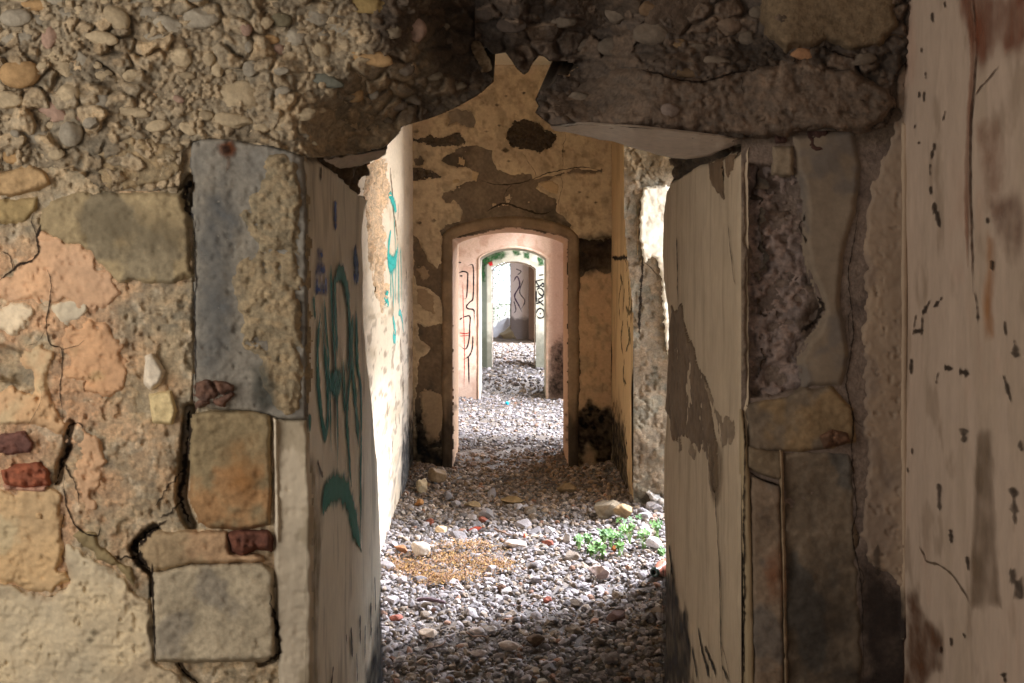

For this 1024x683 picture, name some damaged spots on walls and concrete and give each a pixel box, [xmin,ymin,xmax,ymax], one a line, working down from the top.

rust [220,142,235,164]
spalling [0,0,922,449]
crack [484,134,594,215]
spalling [929,143,940,227]
spalling [912,297,942,335]
crack [0,214,101,539]
crack [114,180,197,652]
water stain [565,399,629,490]
peeling [665,303,735,493]
spalling [1009,487,1017,524]
spalling [1009,568,1023,599]